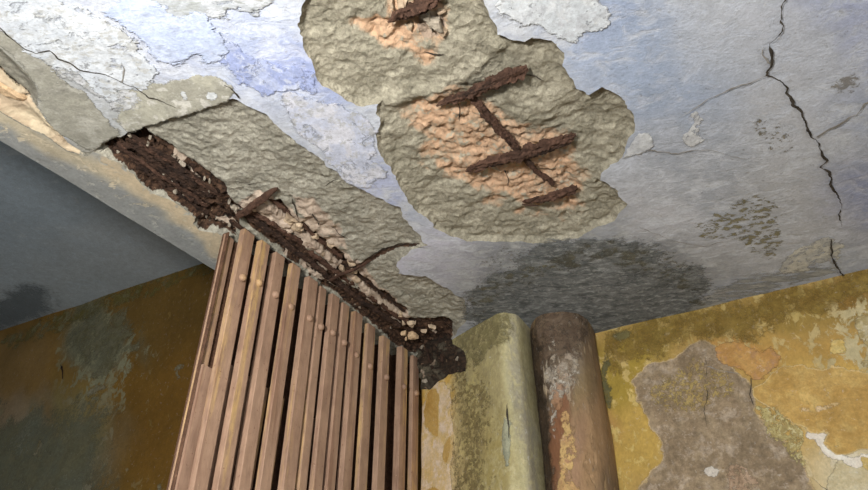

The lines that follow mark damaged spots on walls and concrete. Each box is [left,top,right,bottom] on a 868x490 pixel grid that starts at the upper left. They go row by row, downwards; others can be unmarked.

crack [0,28,175,108]
water stain [0,265,210,349]
spalling [0,0,654,490]
water stain [456,237,868,490]
flaking render [631,315,868,490]
crack [679,0,868,276]